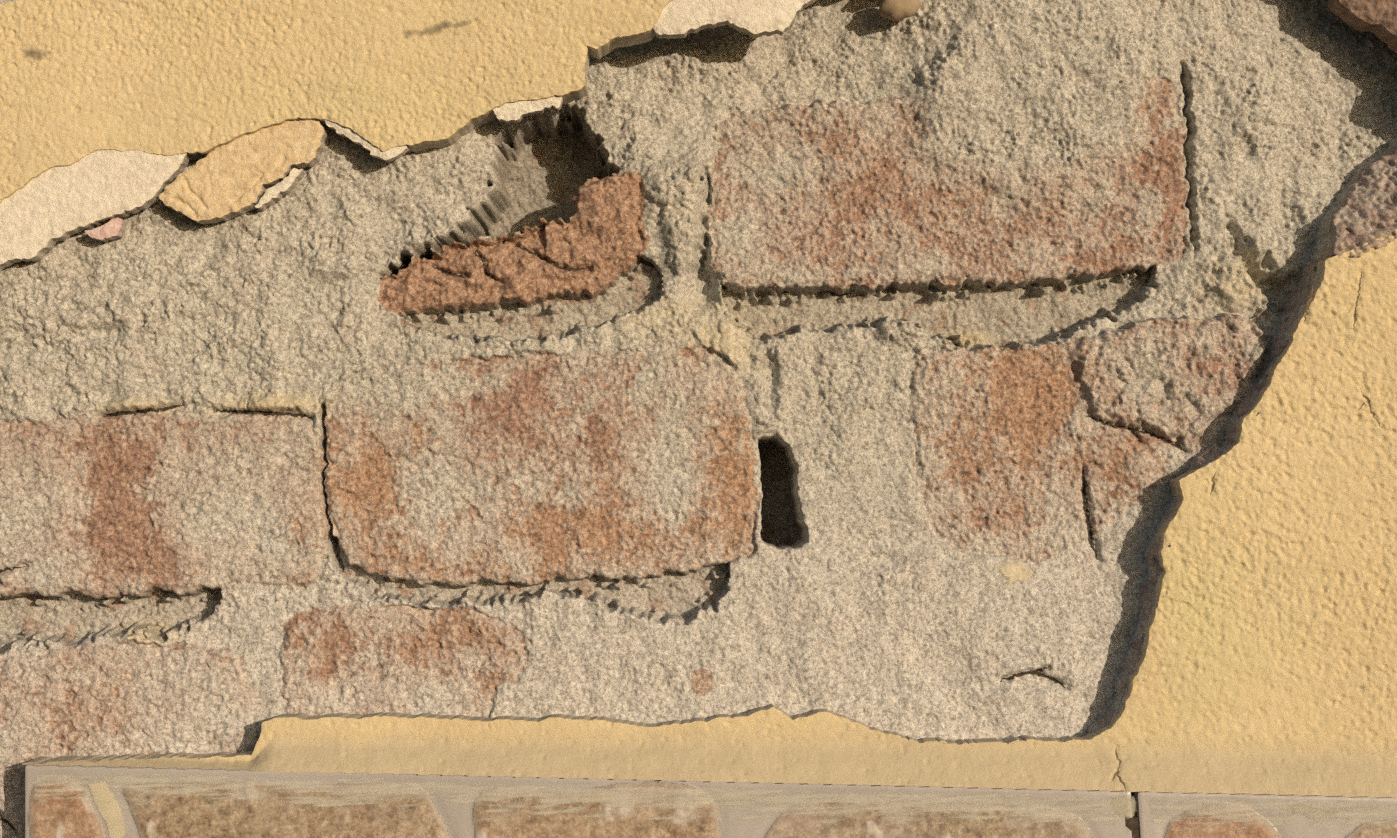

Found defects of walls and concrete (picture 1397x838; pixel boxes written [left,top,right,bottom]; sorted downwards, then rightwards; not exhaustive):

spalling [653,0,817,39]
spalling [1328,0,1397,53]
spalling [0,119,409,273]
spalling [393,96,619,274]
spalling [1194,144,1397,477]
spalling [758,437,808,550]
spalling [1091,539,1171,733]